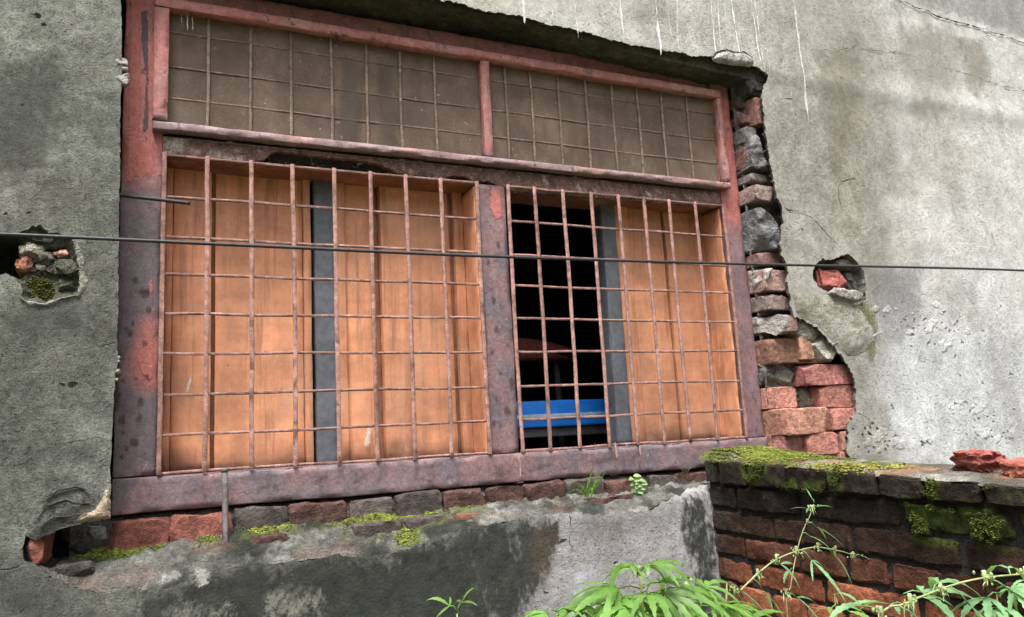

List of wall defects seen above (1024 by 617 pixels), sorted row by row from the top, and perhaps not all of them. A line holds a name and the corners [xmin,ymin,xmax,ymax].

water stain [655,0,678,53]
water stain [711,0,740,55]
water stain [750,0,770,68]
water stain [793,0,810,123]
crack [897,0,1024,46]
spalling [0,211,88,306]
flaking render [711,49,905,458]
spalling [25,526,108,565]
water stain [143,520,559,617]